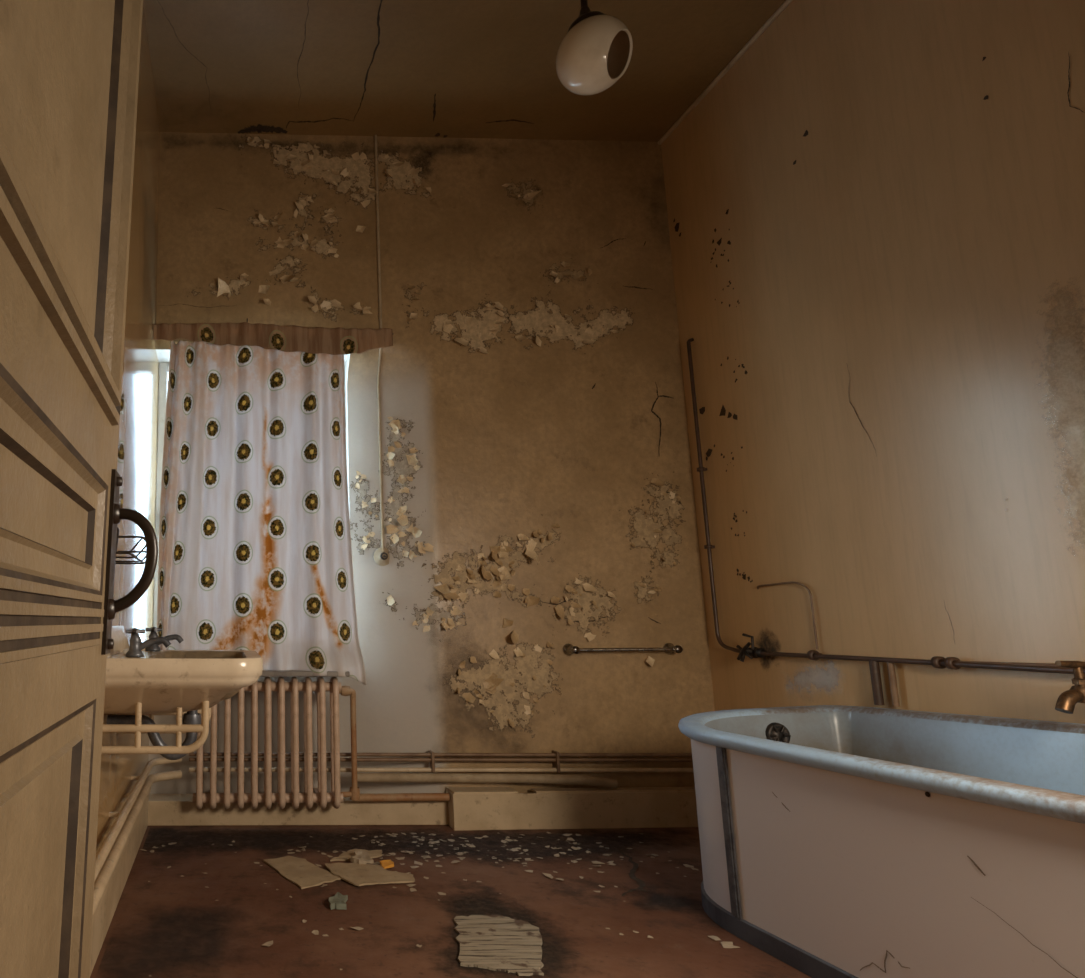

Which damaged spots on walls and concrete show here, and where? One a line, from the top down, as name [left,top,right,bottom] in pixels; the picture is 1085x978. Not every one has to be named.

crack [238,0,383,134]
peeling [187,134,433,322]
peeling [402,282,635,354]
peeling [349,417,624,642]
peeling [442,618,563,744]